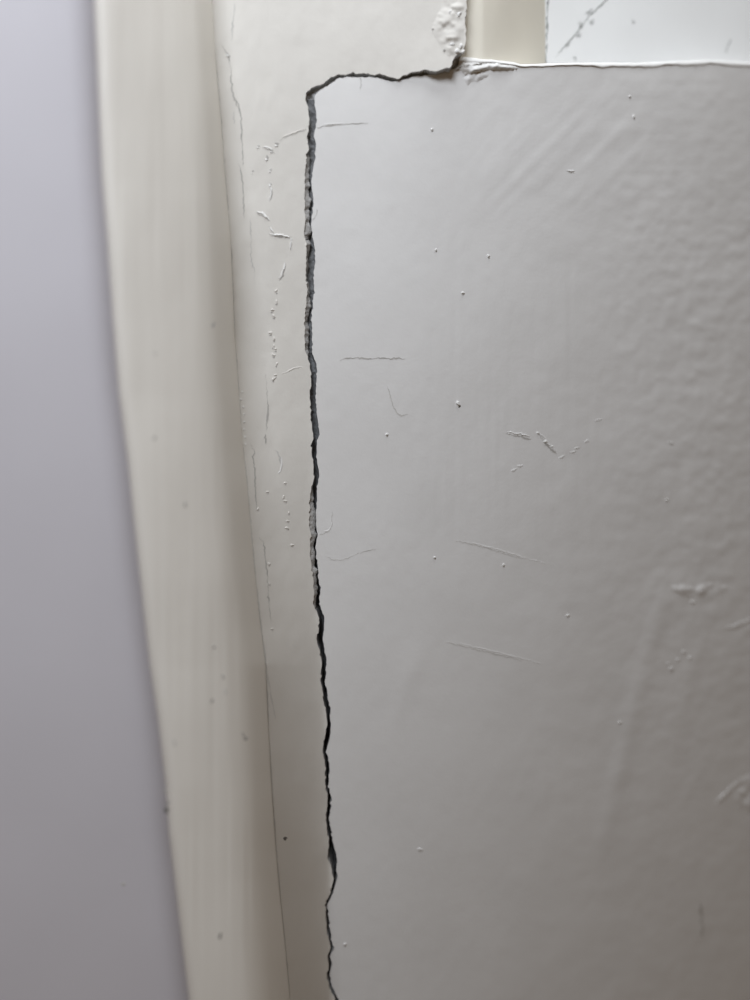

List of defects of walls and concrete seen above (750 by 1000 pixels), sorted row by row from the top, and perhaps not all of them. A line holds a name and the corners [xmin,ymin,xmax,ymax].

crack [451,58,460,69]
spalling [431,0,518,85]
crack [283,74,427,1000]